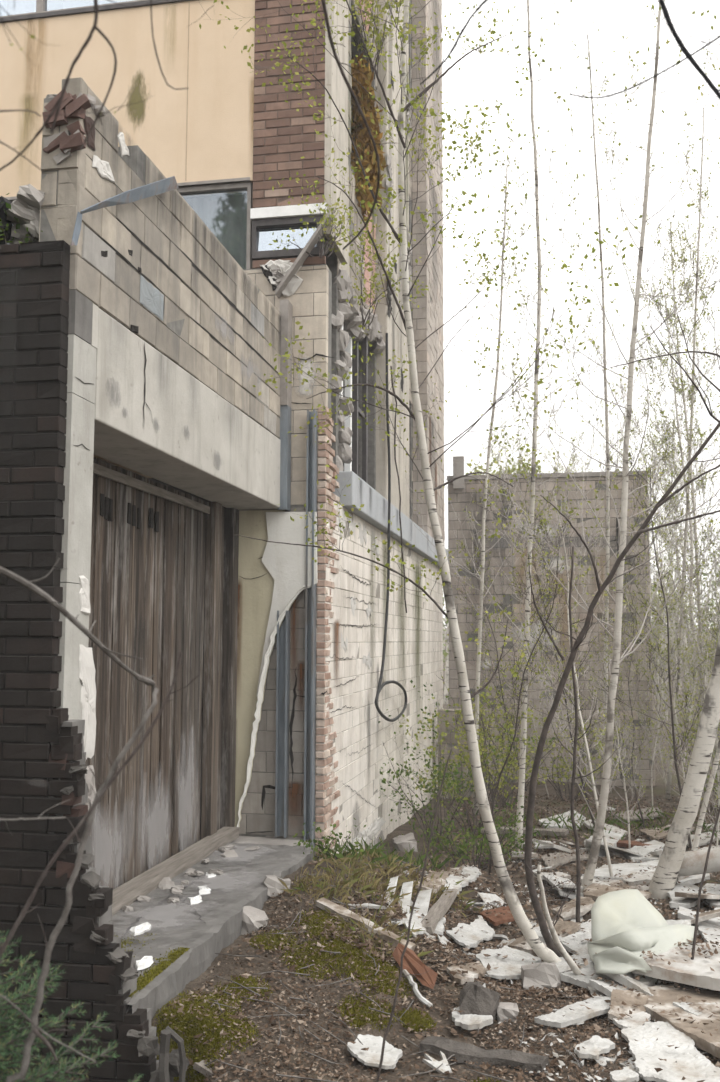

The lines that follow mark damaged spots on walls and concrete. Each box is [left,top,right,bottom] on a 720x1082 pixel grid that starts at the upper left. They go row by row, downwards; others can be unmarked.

spalling [42,90,115,183]
spalling [117,132,129,157]
water stain [128,74,145,123]
crack [143,343,153,422]
flaking render [235,165,412,855]
peeling [79,576,90,615]
spalling [45,644,189,1082]
peeling [187,872,216,905]